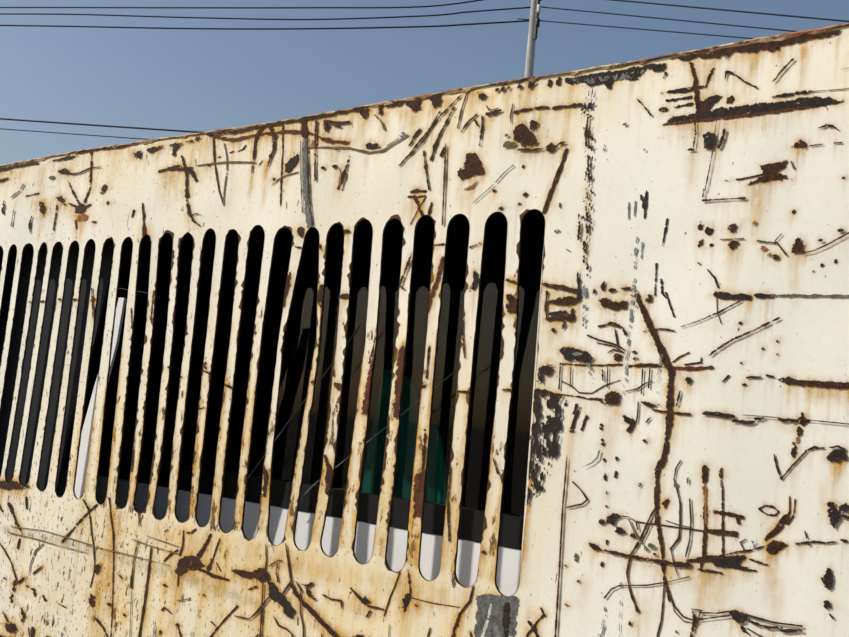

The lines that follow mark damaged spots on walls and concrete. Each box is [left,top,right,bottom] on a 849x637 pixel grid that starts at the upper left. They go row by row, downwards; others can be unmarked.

rust [39,145,131,231]
rust [158,126,277,182]
rust [457,153,485,190]
rust [503,120,565,152]
peeling [559,346,593,363]
peeling [526,362,588,505]
peeling [622,401,691,434]
peeling [702,411,764,424]
peeling [751,496,796,556]
rust [589,543,693,568]
rust [163,530,270,637]
peeling [474,594,519,637]